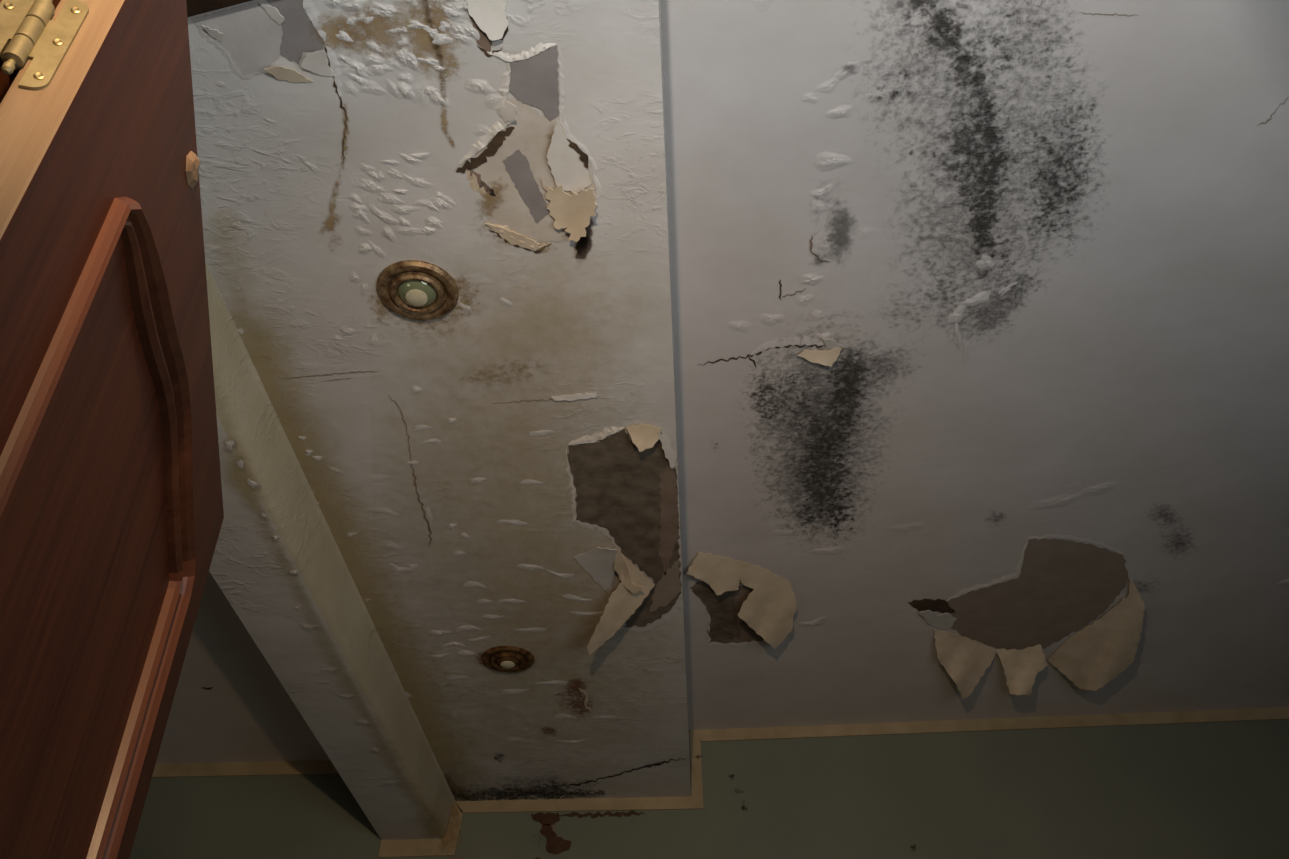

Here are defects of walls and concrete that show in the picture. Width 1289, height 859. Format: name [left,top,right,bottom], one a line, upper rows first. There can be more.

peeling [456,0,602,259]
damp [879,0,1094,281]
spalling [565,424,797,655]
damp [750,347,897,532]
spalling [908,534,1145,699]